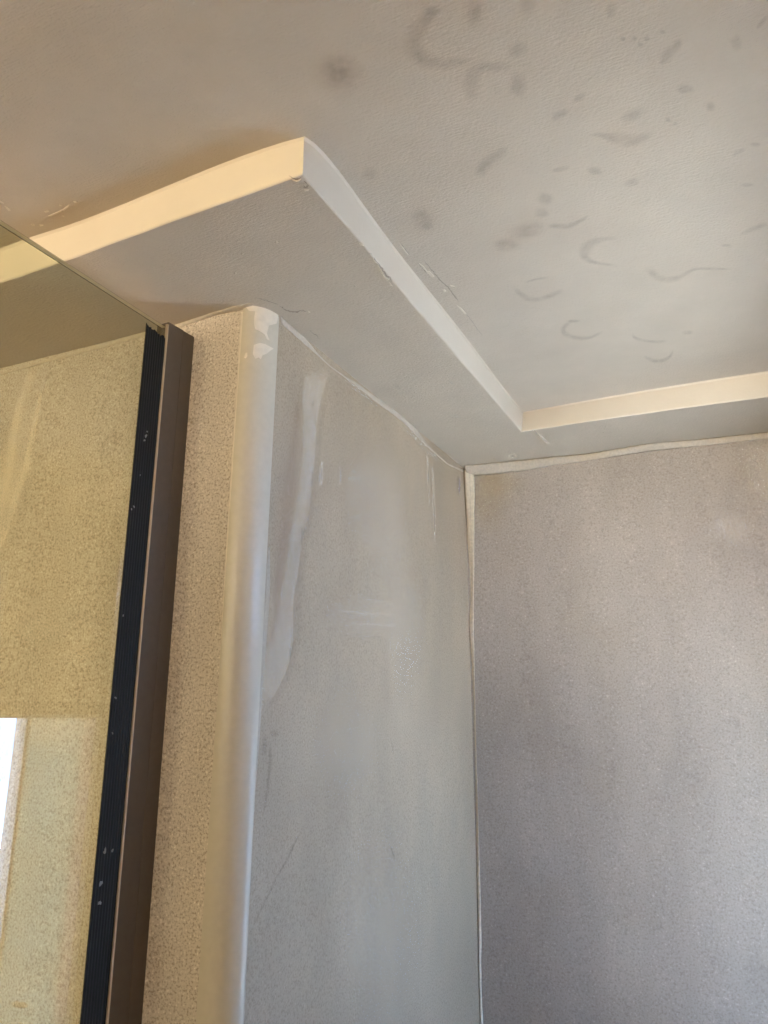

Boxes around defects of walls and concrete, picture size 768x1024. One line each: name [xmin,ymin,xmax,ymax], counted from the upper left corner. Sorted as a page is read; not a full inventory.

peeling [244,306,279,359]